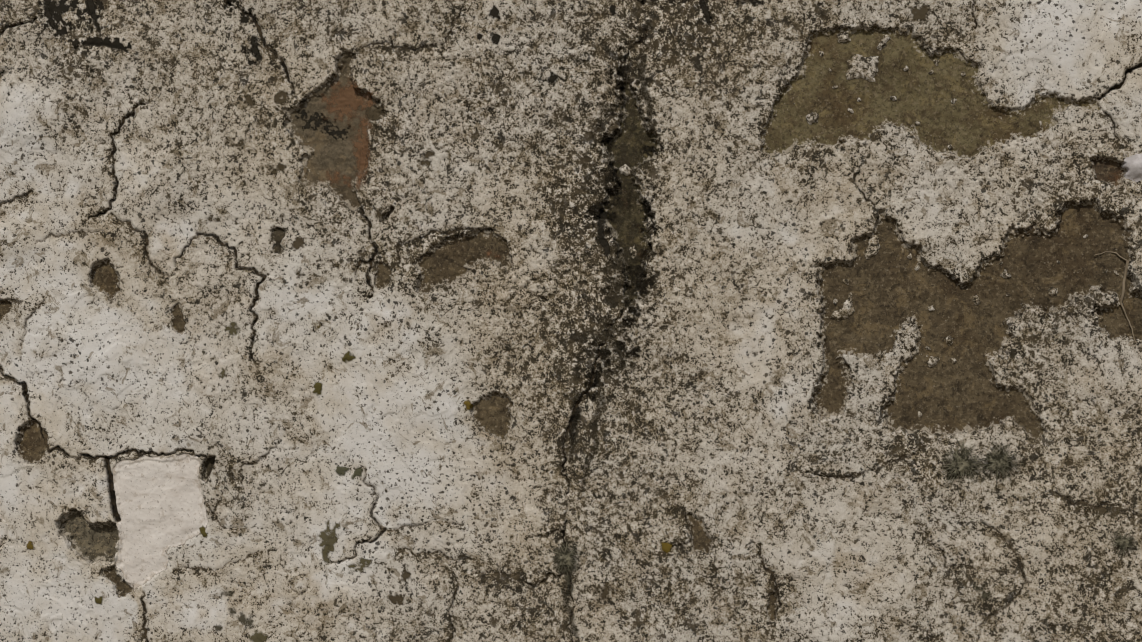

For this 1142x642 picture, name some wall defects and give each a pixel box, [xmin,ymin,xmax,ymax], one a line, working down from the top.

crack [224,0,297,99]
corrosion [322,81,375,188]
spalling [760,25,1100,160]
crack [1095,63,1142,139]
crack [0,191,31,206]
crack [0,299,45,327]
crack [39,102,267,362]
spalling [413,228,513,295]
spalling [810,201,1142,441]
crack [0,366,205,522]
spalling [58,453,216,598]
crack [140,592,149,642]